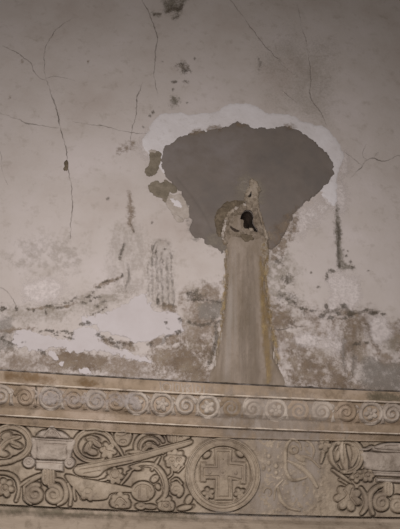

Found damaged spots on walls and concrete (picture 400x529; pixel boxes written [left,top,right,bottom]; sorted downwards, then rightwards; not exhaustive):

flaking render [145,149,189,222]
spalling [214,178,269,261]
flaking render [12,293,184,366]
water stain [0,237,400,401]